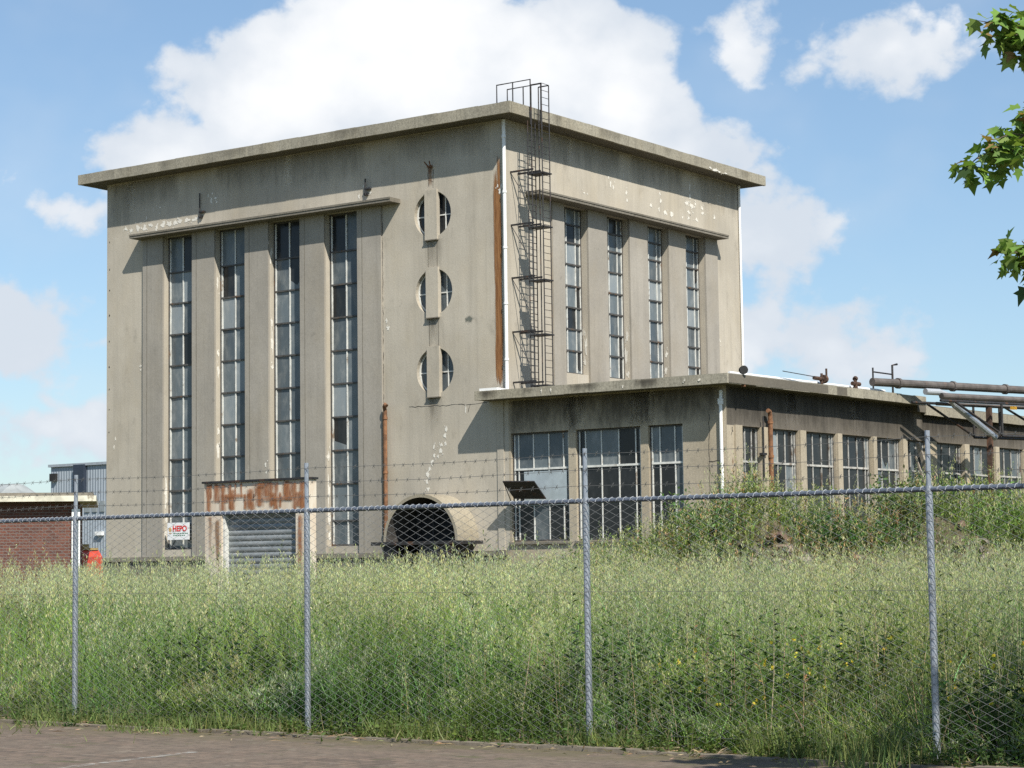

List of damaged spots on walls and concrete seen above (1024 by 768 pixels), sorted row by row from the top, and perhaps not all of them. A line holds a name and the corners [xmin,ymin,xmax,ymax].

peeling [123,207,198,233]
peeling [650,183,715,222]
rust [493,159,503,383]
peeling [425,426,447,491]
rust [206,481,305,570]